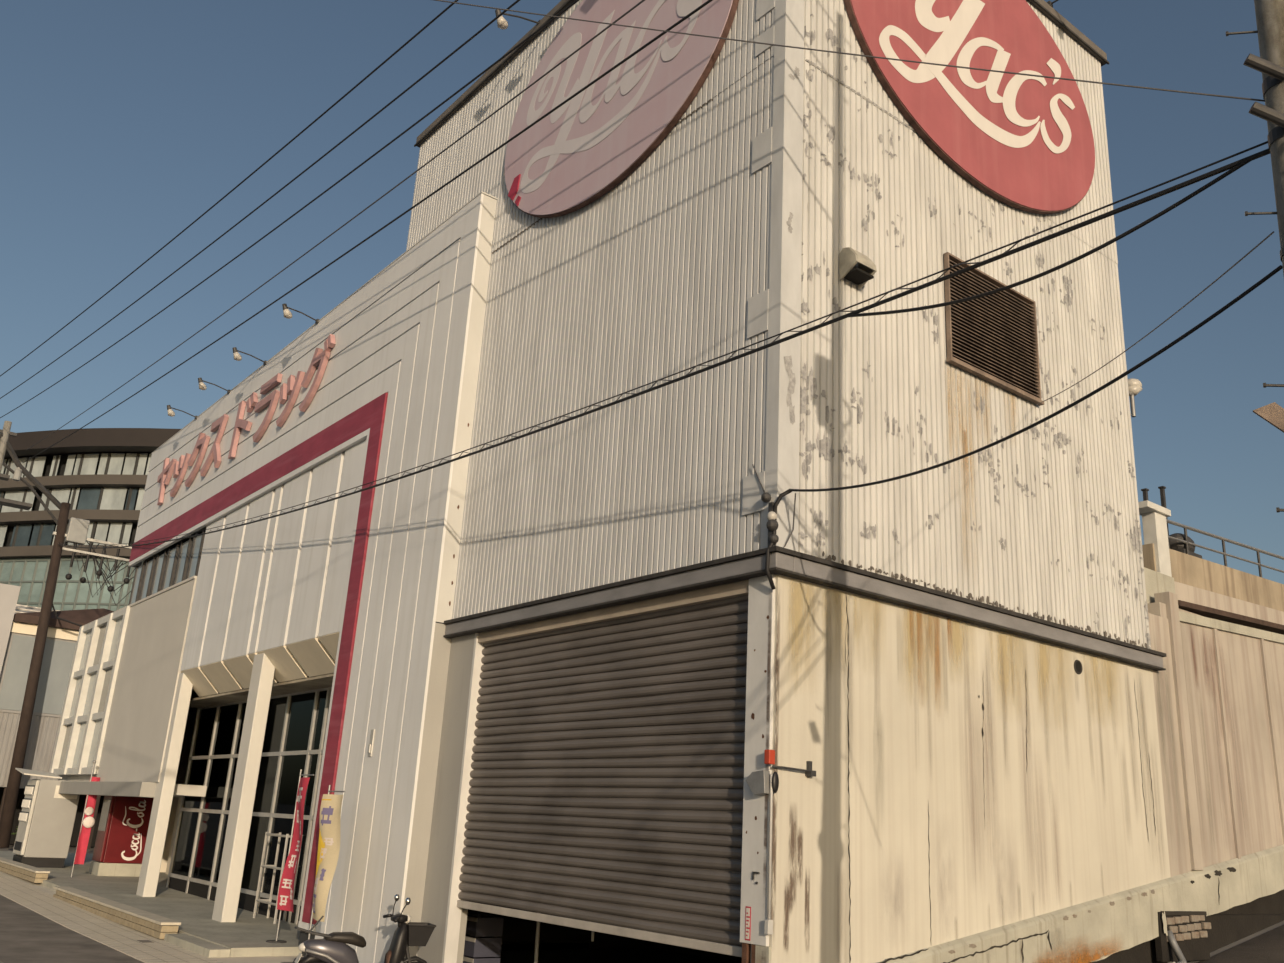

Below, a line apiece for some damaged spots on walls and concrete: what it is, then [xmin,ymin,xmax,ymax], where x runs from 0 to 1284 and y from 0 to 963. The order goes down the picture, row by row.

peeling [1022,214,1075,342]
peeling [784,356,867,480]
peeling [884,386,951,474]
peeling [978,413,1087,507]
peeling [1039,358,1122,430]
peeling [798,501,1151,649]
damp [767,583,809,721]
corrosion [910,614,951,670]
damp [998,634,1014,689]
crack [845,596,1052,963]
damp [764,794,809,947]
corrosion [1071,949,1112,963]